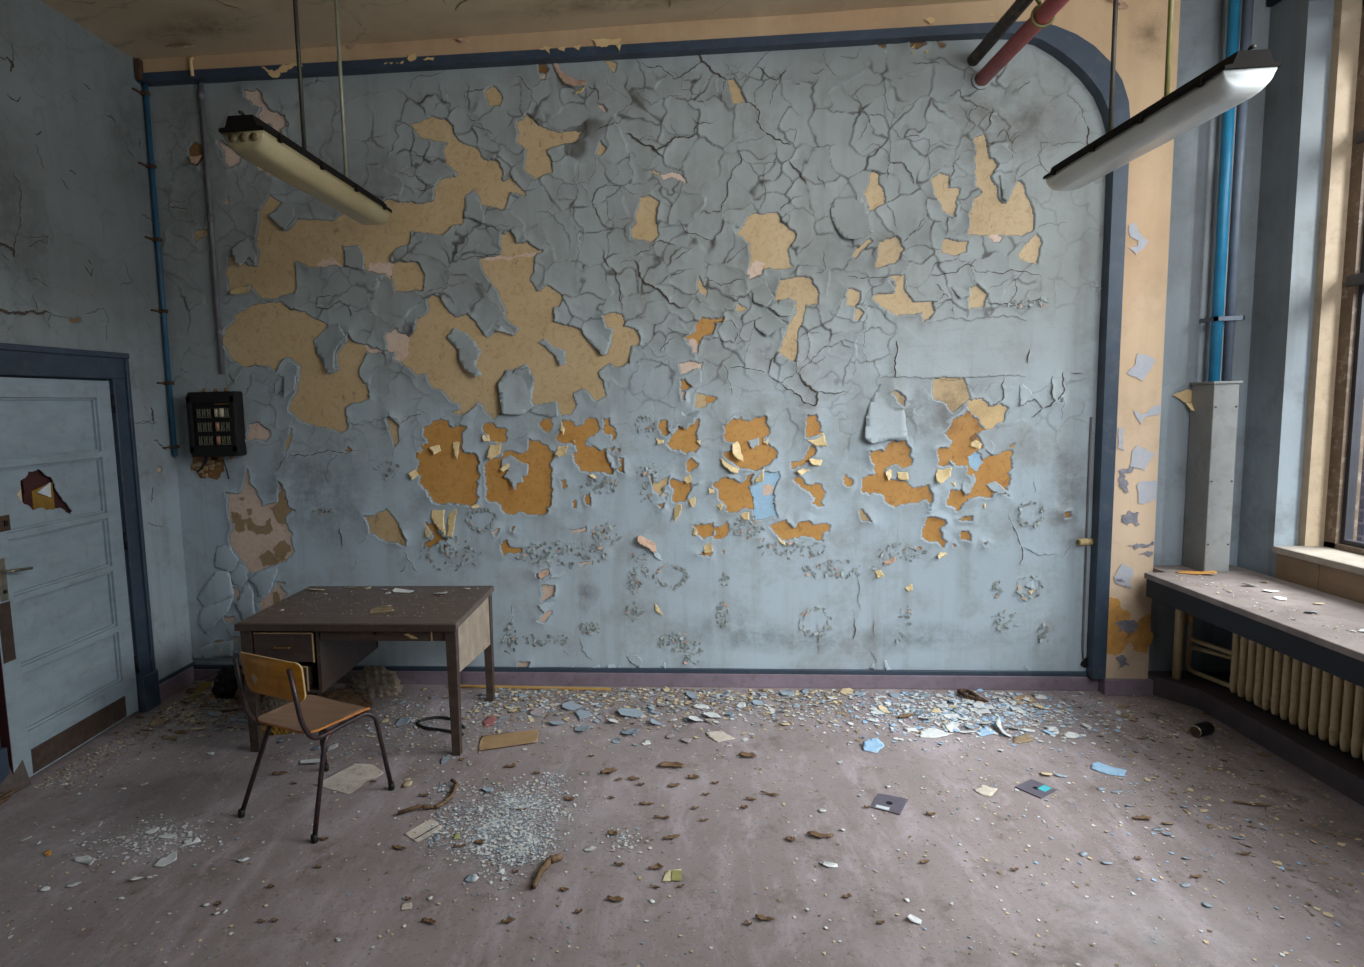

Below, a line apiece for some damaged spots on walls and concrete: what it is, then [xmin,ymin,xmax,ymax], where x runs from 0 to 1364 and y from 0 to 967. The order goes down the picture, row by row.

crack [0,46,21,102]
flaking render [245,90,289,133]
peeling [539,38,621,94]
crack [0,131,134,341]
peeling [632,196,659,243]
peeling [847,237,934,321]
peeling [931,134,1041,264]
peeling [223,115,648,555]
peeling [650,213,830,557]
peeling [843,377,1033,559]
flaking render [227,470,294,573]
peeling [1107,597,1154,656]